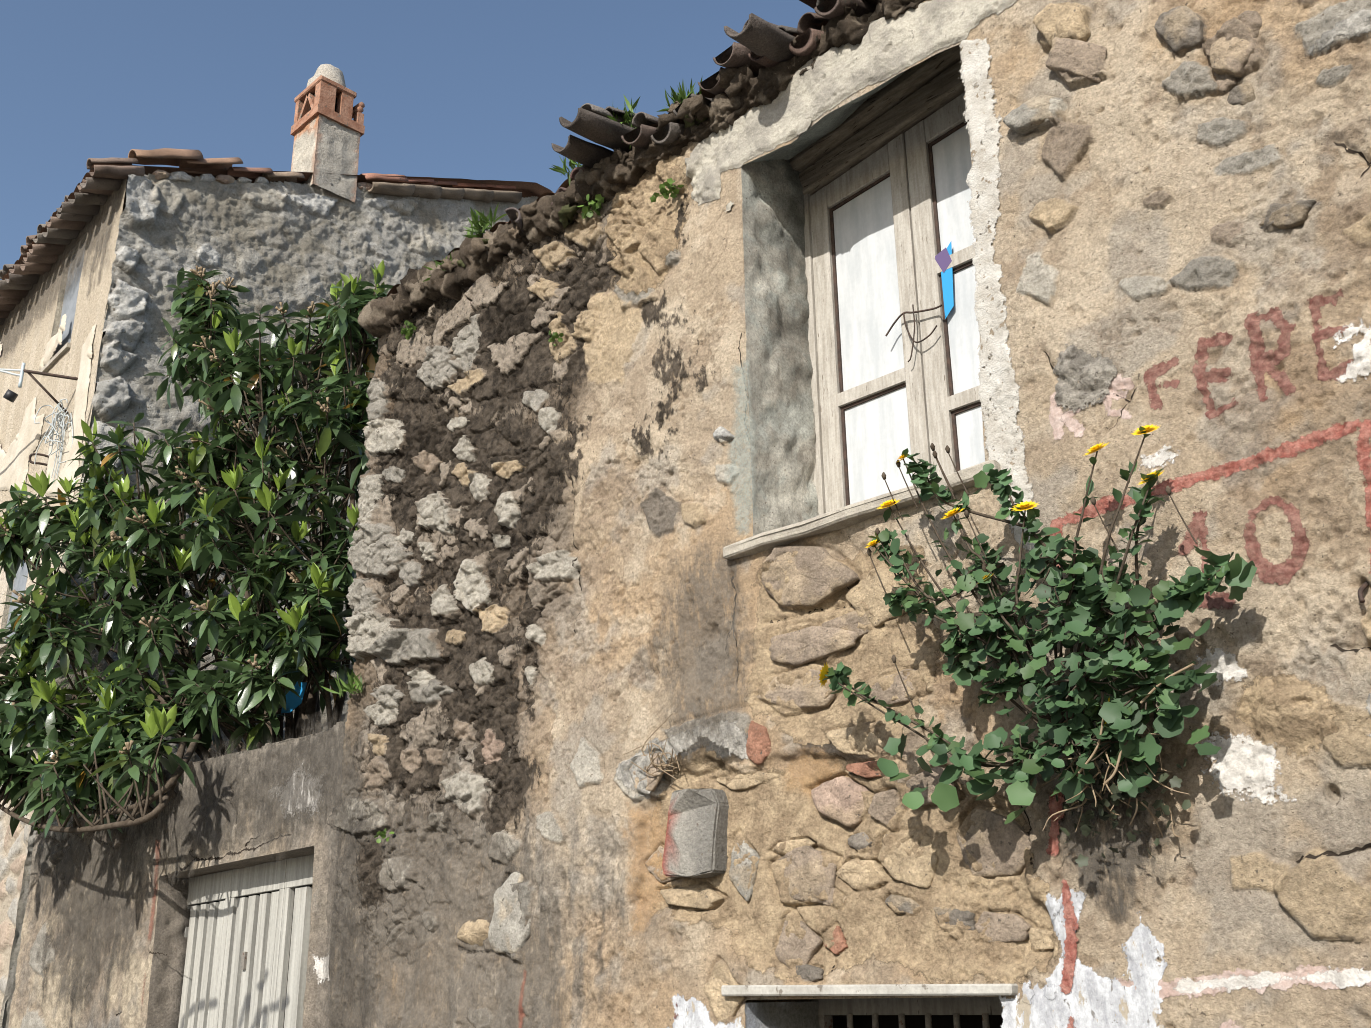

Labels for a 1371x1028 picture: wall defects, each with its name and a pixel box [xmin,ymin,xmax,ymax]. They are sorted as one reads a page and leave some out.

leakage [33,717,564,1028]
flaking render [457,871,531,954]
spalling [629,545,1168,1028]
leakage [1058,776,1164,920]
crack [1296,843,1371,863]